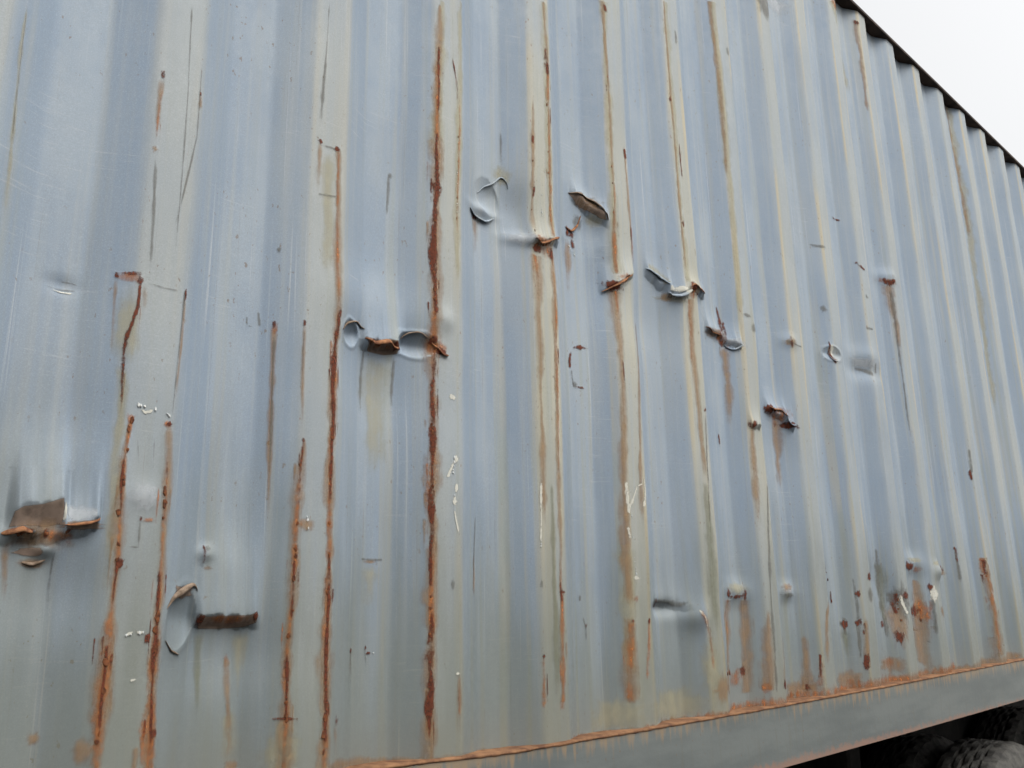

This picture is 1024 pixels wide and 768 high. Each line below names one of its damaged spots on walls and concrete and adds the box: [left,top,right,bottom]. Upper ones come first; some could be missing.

rust [544,38,552,191]
rust [76,415,170,765]
rust [115,271,143,399]
rust [273,545,299,768]
rust [321,309,385,767]
rust [424,6,445,755]
rust [543,582,567,705]
rust [611,279,631,596]
rust [727,551,1018,710]